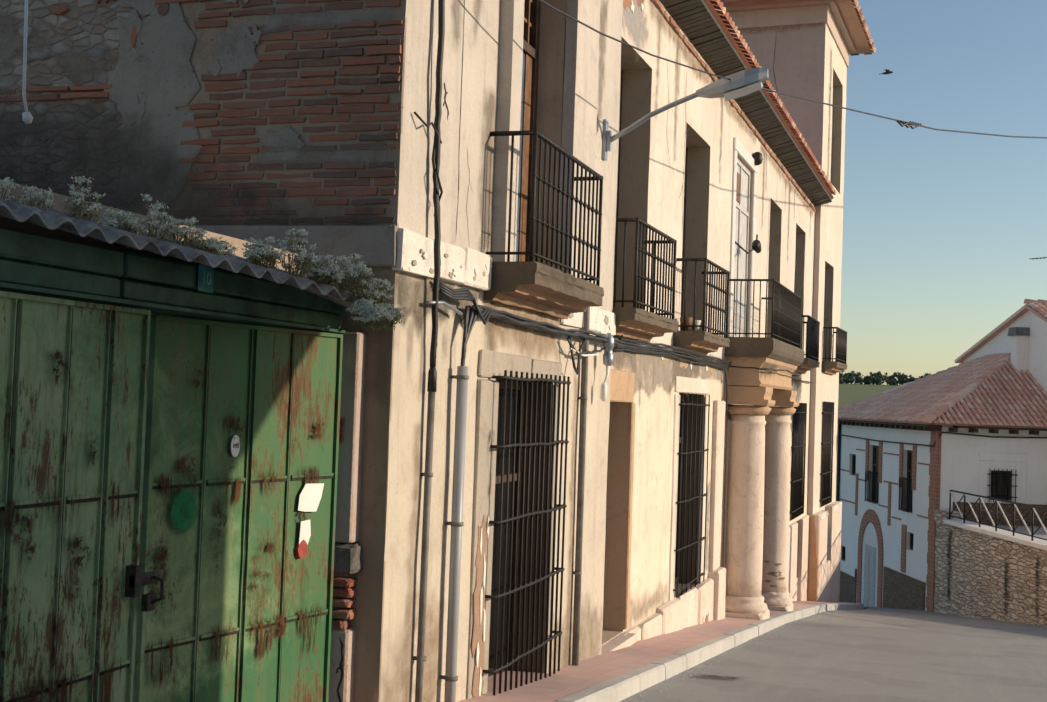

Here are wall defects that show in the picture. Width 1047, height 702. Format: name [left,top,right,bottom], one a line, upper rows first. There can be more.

corrosion [301,467,319,484]
corrosion [0,501,36,560]
corrosion [48,490,89,599]
corrosion [215,467,241,571]
spalling [764,561,785,587]
peeling [472,515,489,698]
corrosion [253,615,286,659]
corrosion [91,661,121,702]
crack [336,637,344,702]